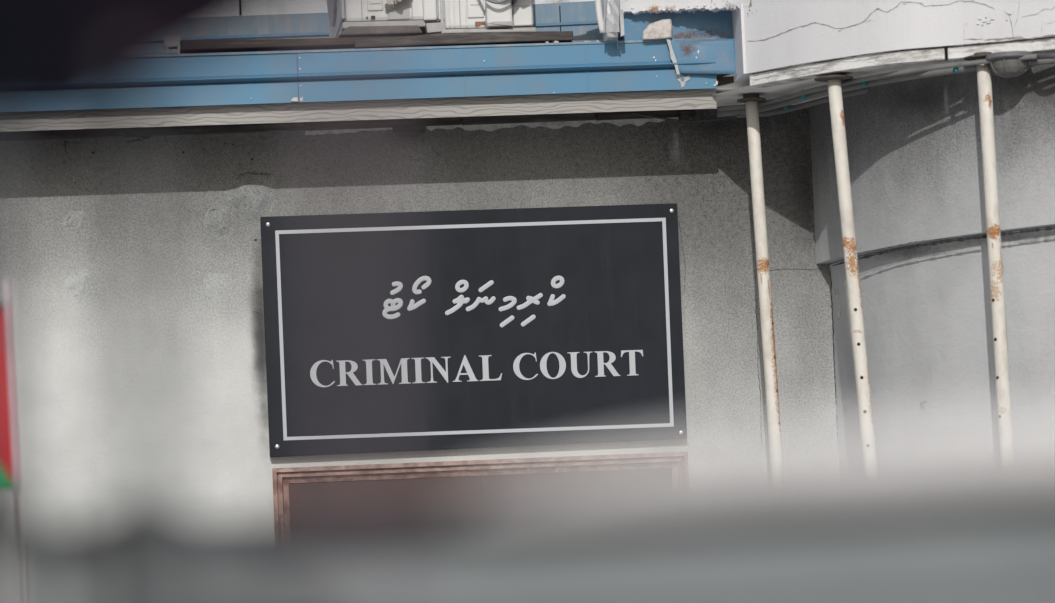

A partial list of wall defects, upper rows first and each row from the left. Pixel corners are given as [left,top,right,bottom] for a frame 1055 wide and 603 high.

crack [758,1,1055,41]
corrosion [757,259,781,432]